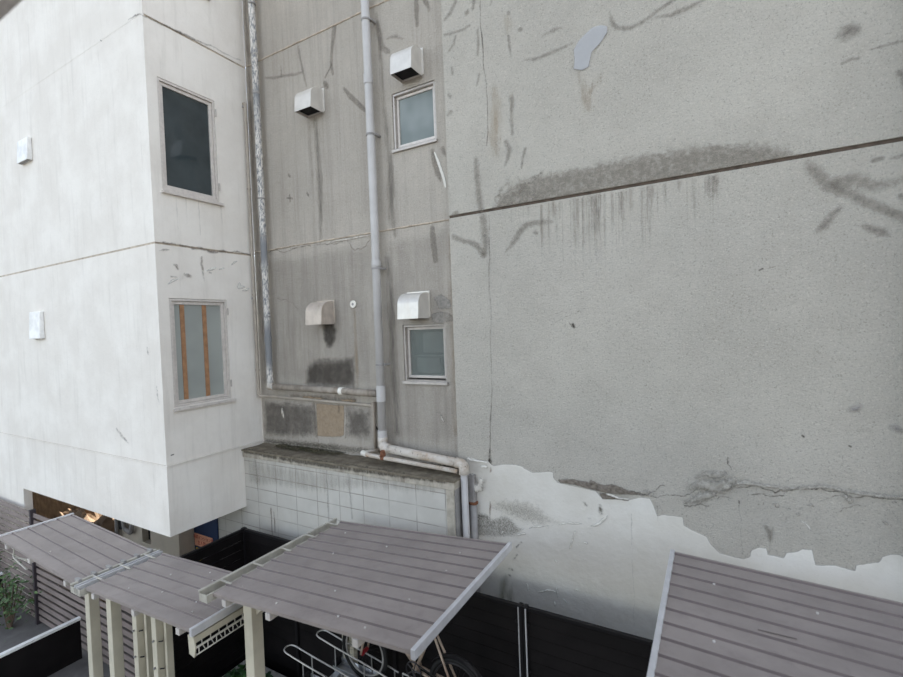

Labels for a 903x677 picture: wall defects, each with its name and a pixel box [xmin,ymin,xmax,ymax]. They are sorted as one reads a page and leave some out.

damp [244,404,444,483]
spalling [559,479,640,501]